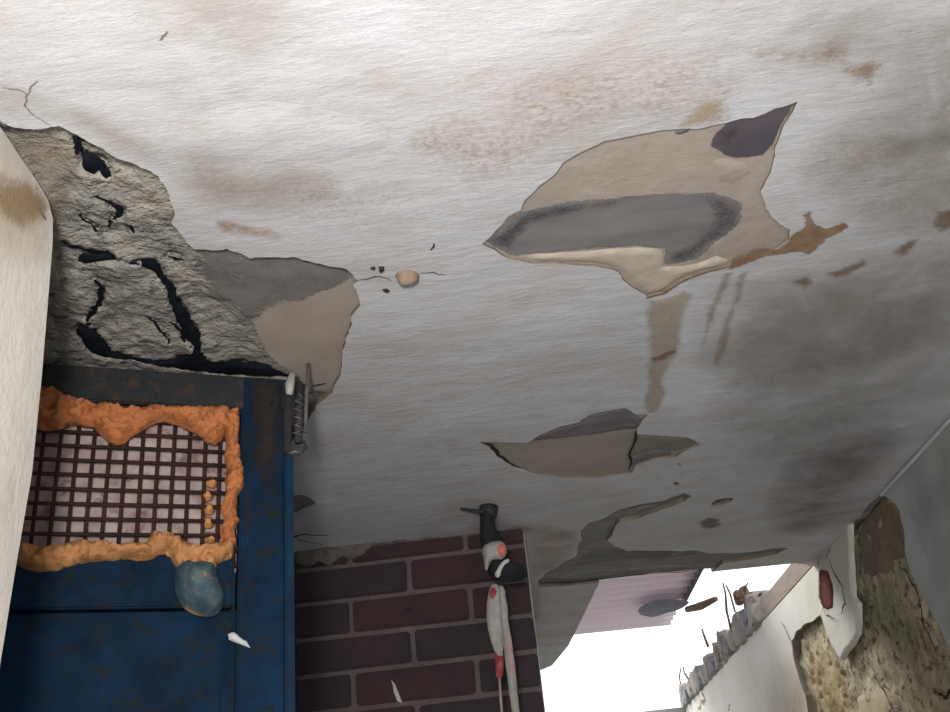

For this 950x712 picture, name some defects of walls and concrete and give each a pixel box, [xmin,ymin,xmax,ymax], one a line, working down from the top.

leakage [0,182,45,220]
spalling [0,125,359,431]
peeling [484,103,794,299]
rust [730,212,848,276]
leakage [936,212,950,229]
leakage [647,294,688,411]
peeling [483,408,699,477]
spalling [538,494,781,584]
spalling [800,496,950,712]